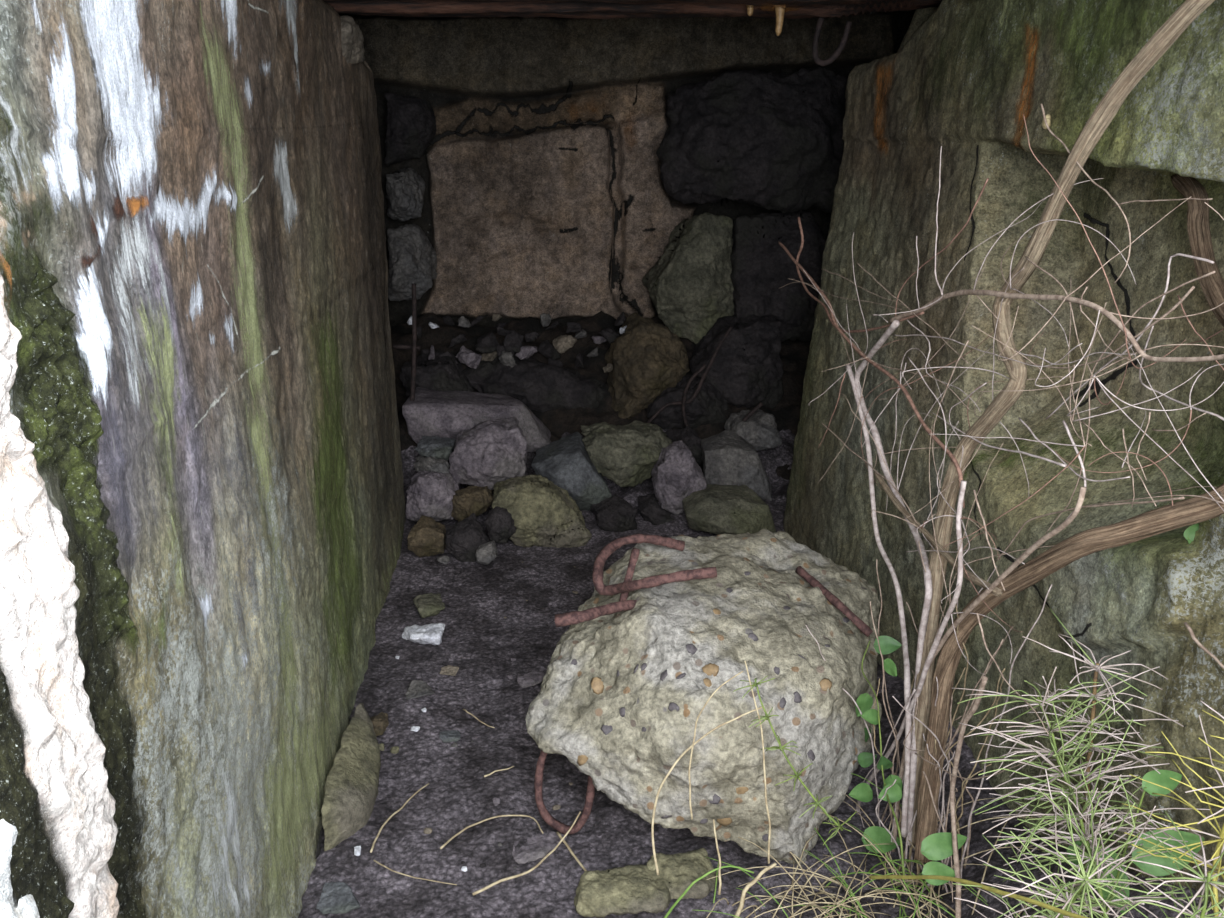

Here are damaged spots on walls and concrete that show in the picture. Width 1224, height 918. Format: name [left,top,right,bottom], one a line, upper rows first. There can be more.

water stain [221,0,241,55]
water stain [281,0,301,100]
water stain [0,92,29,200]
water stain [43,0,237,405]
water stain [273,142,297,230]
crack [386,78,655,317]
water stain [0,277,119,918]